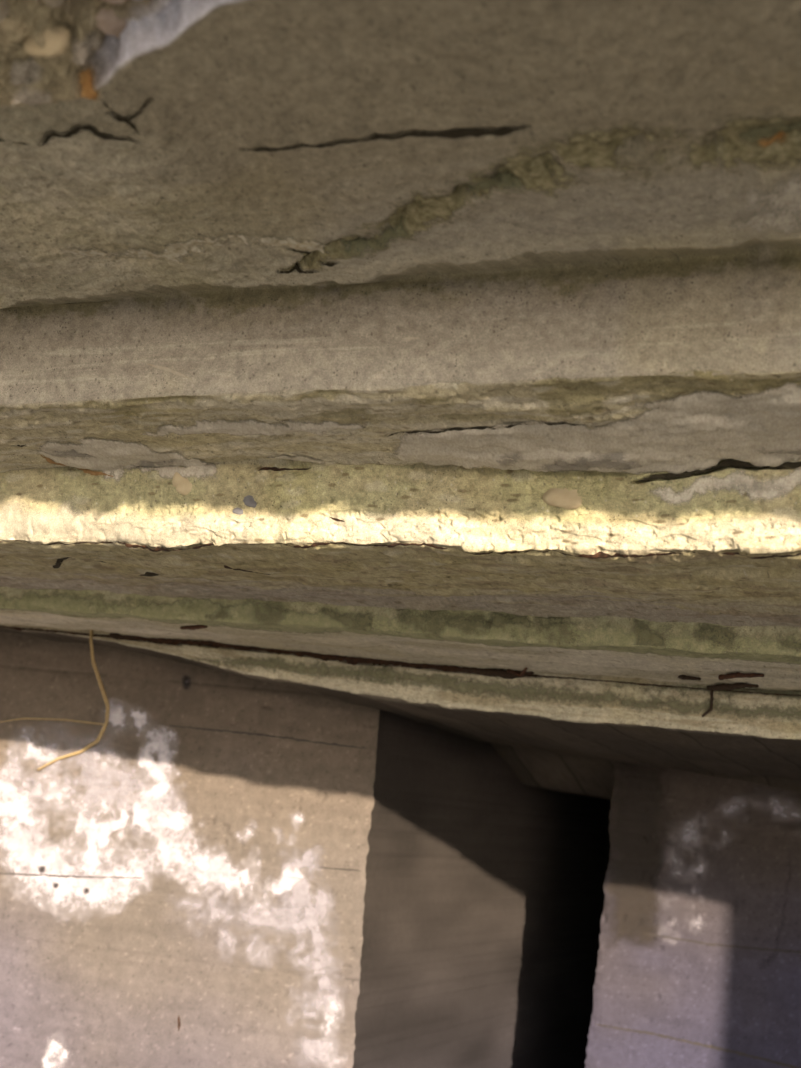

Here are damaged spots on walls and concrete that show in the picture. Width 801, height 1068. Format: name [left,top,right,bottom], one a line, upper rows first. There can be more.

spalling [0,0,240,106]
crack [0,101,151,147]
crack [246,127,527,152]
peeling [645,391,742,412]
peeling [547,453,641,472]
crack [634,459,801,482]
flaking render [232,495,257,515]
flaking render [543,488,582,510]
water stain [0,701,342,1068]